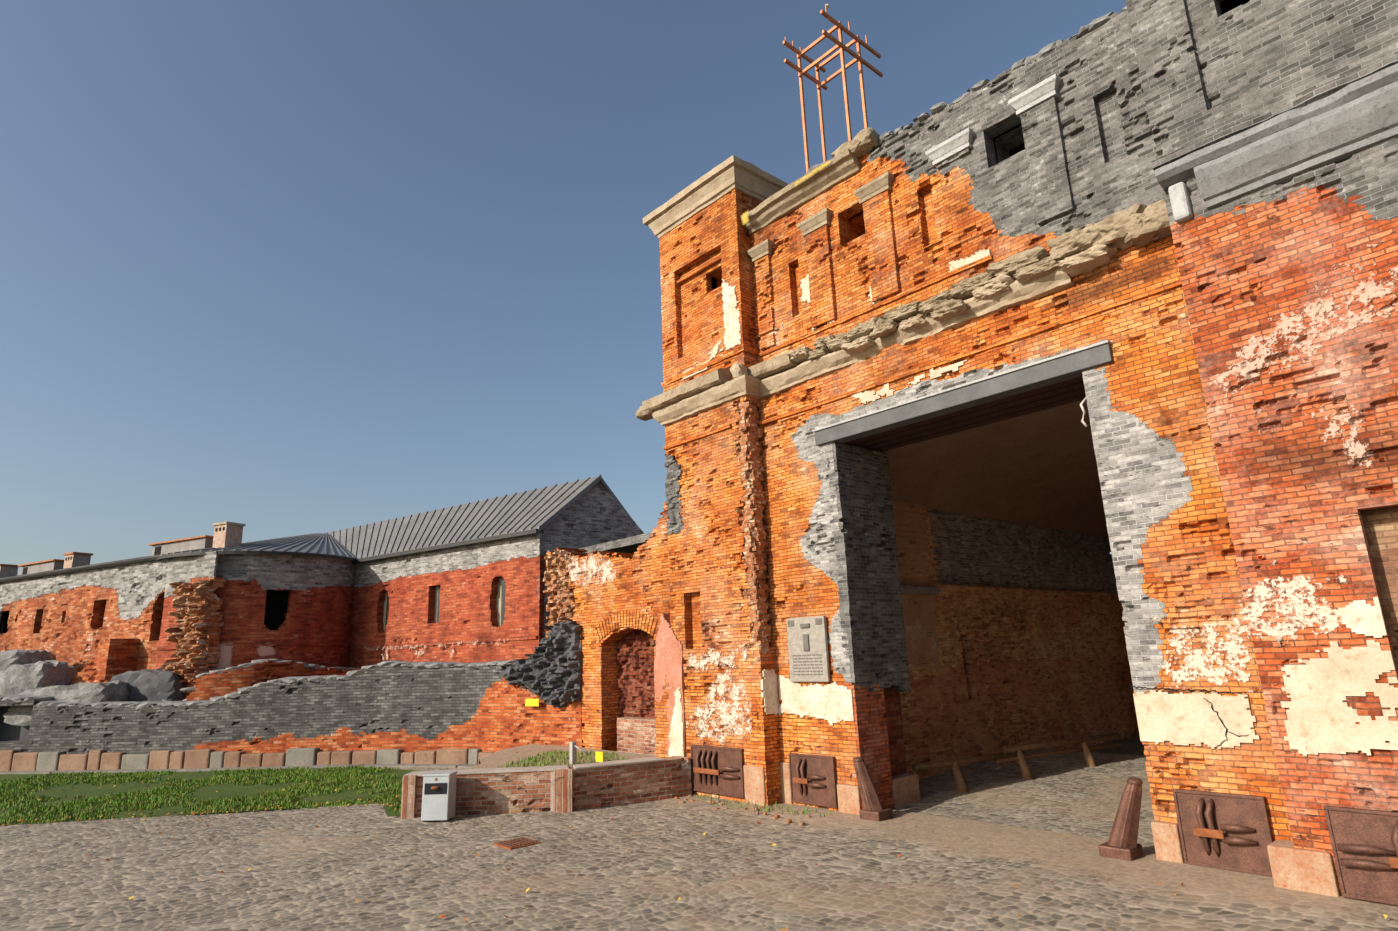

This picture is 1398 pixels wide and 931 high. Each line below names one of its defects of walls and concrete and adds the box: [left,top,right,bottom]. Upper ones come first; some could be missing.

spalling [807,6,1127,174]
spalling [1168,182,1193,224]
spalling [160,579,228,682]
spalling [496,549,616,707]
spalling [668,399,855,757]
flaking render [1133,559,1398,756]